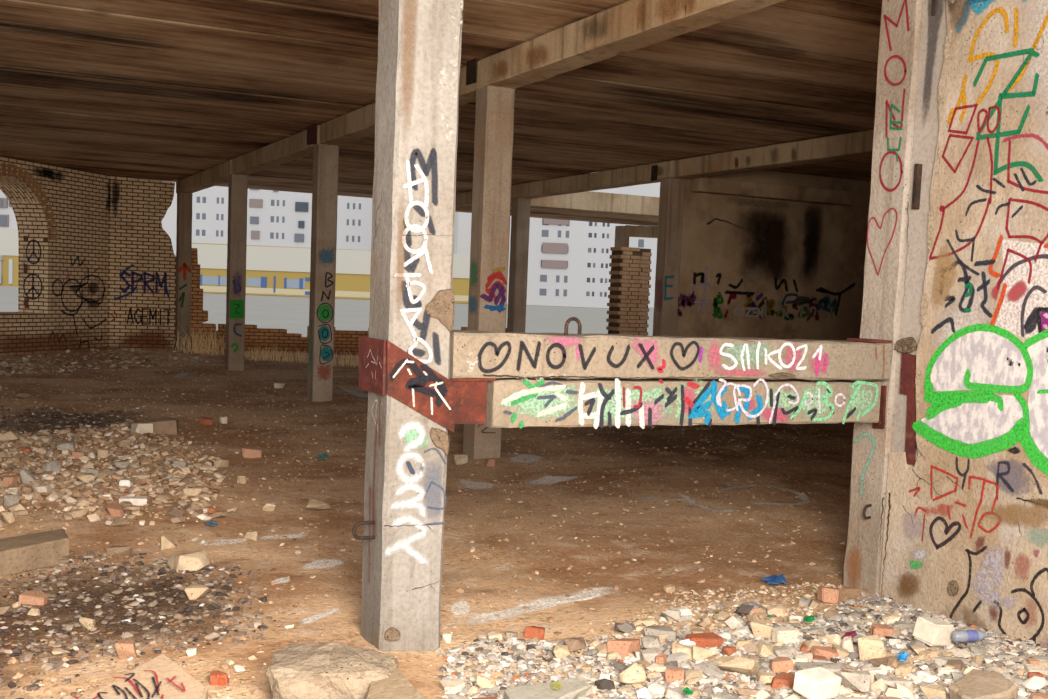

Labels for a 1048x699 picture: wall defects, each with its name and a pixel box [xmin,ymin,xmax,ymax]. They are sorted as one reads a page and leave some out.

water stain [804,212,820,274]